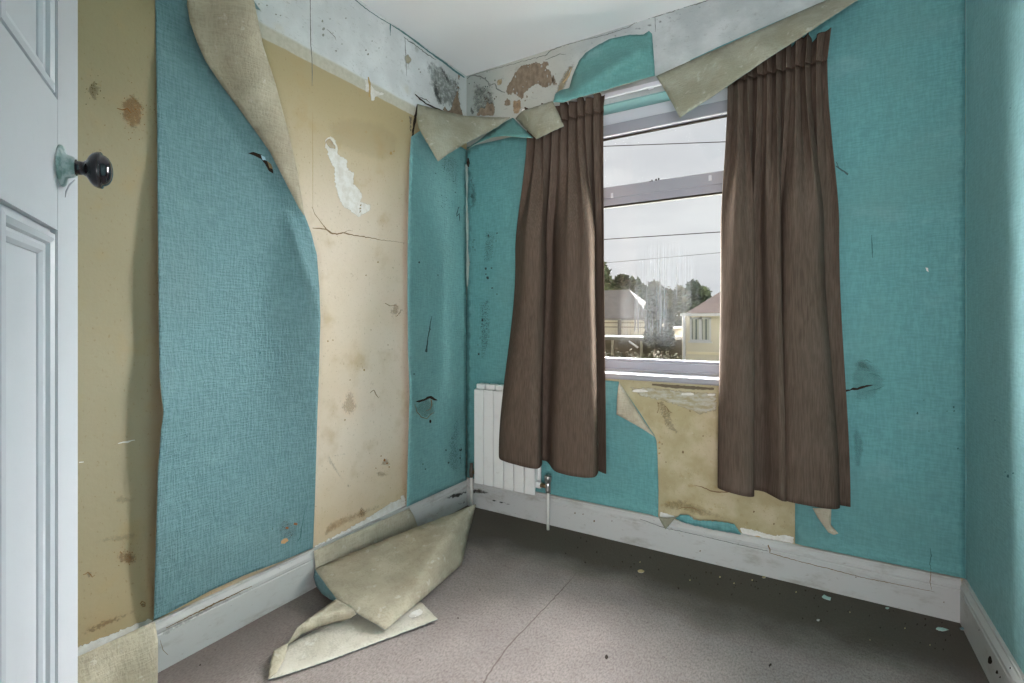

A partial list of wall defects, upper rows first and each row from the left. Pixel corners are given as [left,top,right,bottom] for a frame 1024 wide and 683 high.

leakage [429,66,456,106]
flaking render [477,61,557,116]
peeling [325,136,370,217]
crack [313,210,402,243]
flaking render [315,495,406,547]
flaking render [740,528,794,543]
flaking render [78,619,152,656]